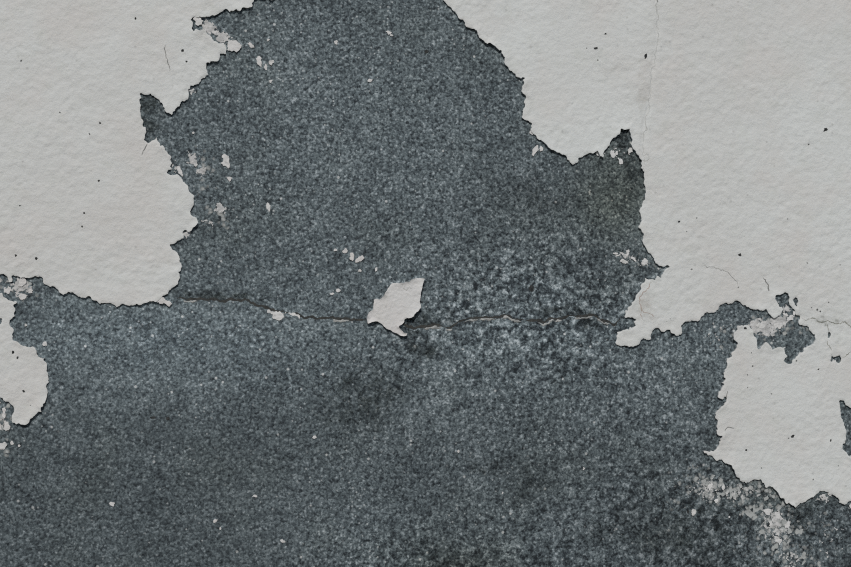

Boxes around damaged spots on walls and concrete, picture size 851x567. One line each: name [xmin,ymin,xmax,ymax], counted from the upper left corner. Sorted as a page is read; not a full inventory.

crack [177,297,364,322]
peeling [139,0,669,328]
peeling [0,274,851,567]
crack [403,313,619,331]